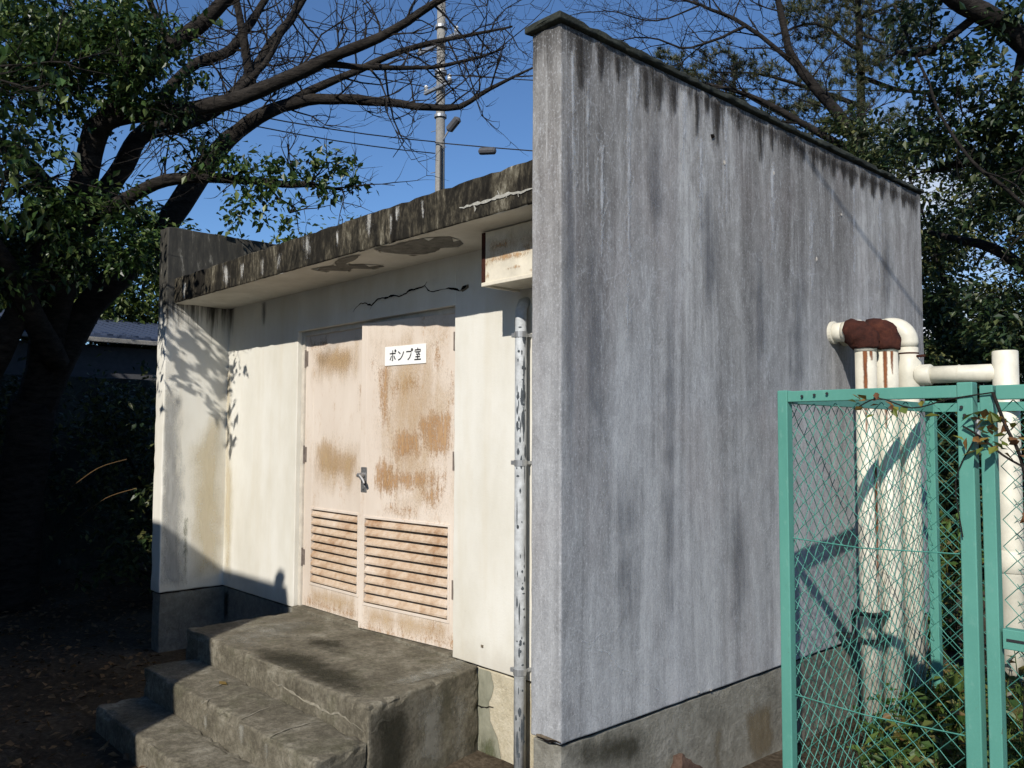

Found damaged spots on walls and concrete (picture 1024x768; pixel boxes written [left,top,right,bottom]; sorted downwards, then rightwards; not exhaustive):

damp [571,37,584,110]
damp [598,45,916,216]
peeling [311,255,384,272]
peeling [374,237,463,256]
crack [353,282,469,312]
rust [863,351,893,389]
rust [374,364,453,507]